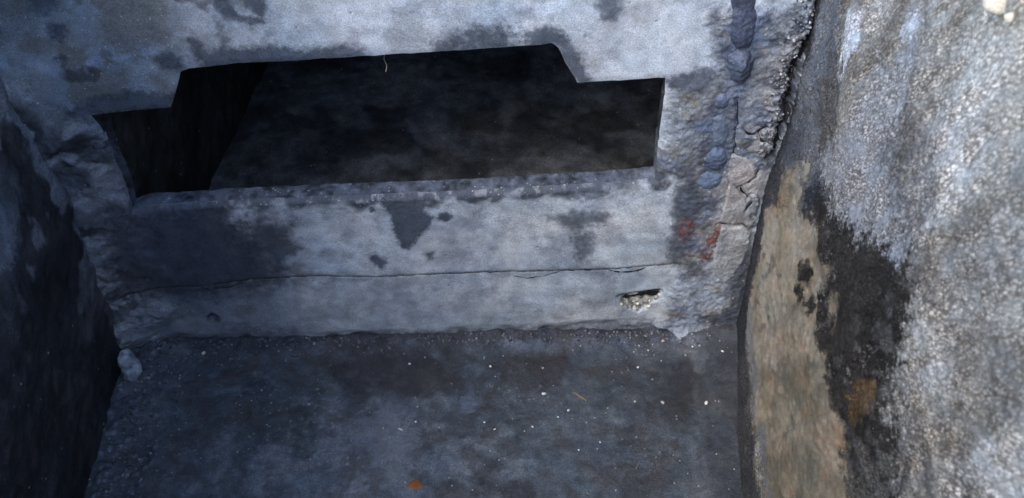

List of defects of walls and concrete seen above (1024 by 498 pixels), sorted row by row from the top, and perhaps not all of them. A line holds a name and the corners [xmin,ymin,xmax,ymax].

leakage [369,194,452,249]
crack [214,263,682,289]
leakage [555,188,610,260]
spalling [620,289,660,312]
corrosion [700,226,721,263]
leakage [794,5,939,498]